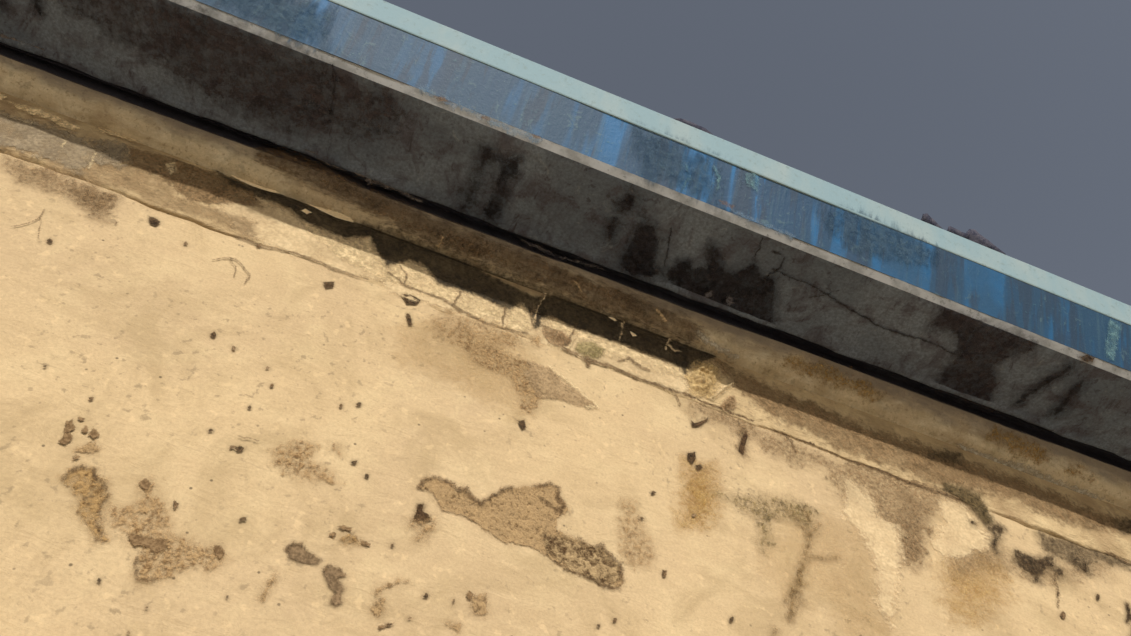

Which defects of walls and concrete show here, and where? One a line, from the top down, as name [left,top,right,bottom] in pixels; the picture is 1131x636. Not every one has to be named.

damp [61,0,400,136]
crack [217,236,961,500]
damp [126,145,1131,626]
flaking render [58,417,111,541]
flaking render [286,542,346,605]
flaking render [410,475,652,587]
crack [773,508,837,633]
crack [1123,602,1131,623]